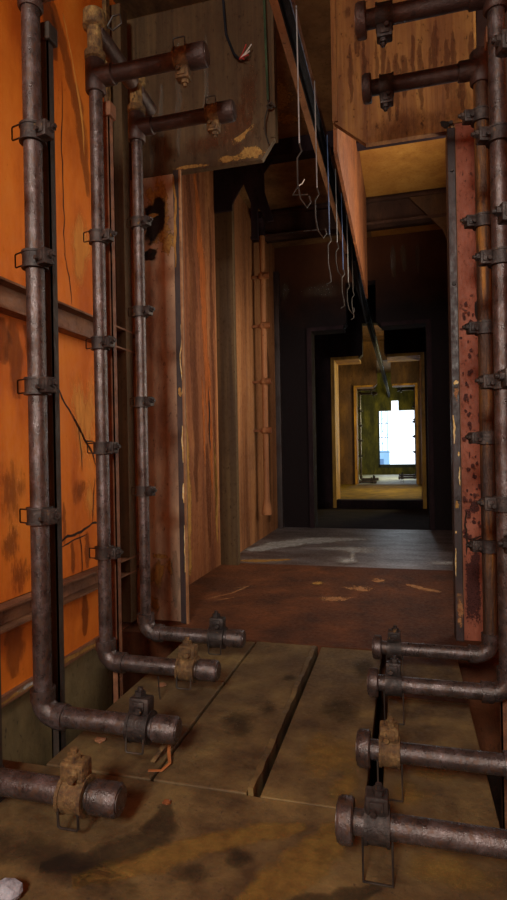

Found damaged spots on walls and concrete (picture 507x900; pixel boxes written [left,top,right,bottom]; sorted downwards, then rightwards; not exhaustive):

peeling [220,125,264,163]
peeling [144,164,208,267]